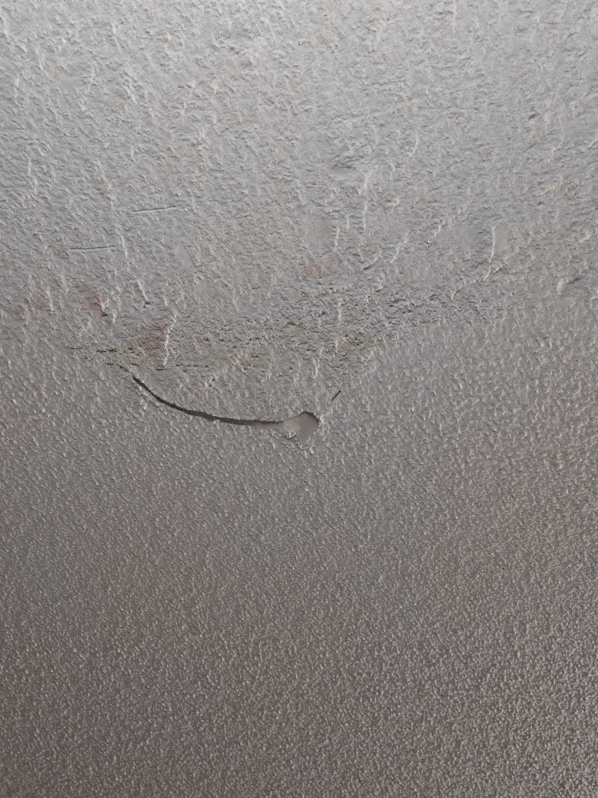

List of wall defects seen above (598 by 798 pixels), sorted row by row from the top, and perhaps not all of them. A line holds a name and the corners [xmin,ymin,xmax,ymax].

crack [69,345,341,452]